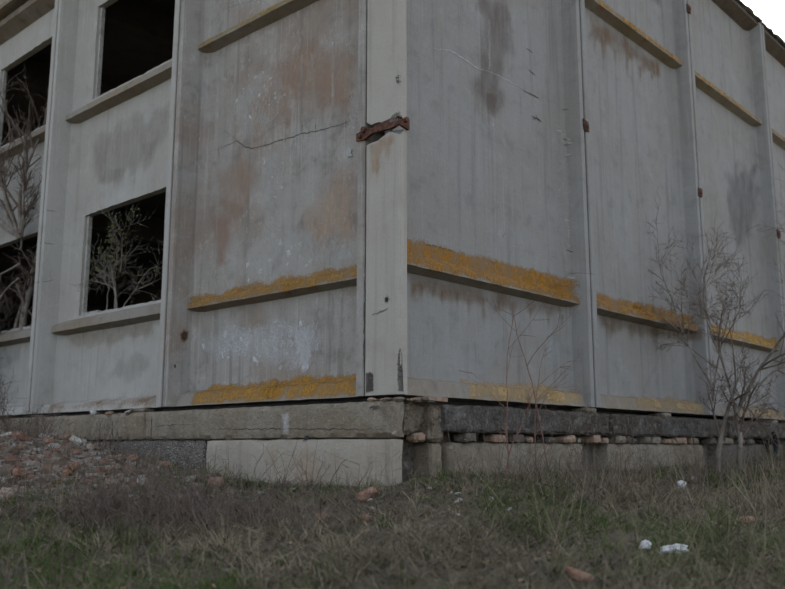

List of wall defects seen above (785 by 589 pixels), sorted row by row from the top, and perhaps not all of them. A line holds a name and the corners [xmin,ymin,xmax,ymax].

crack [218,119,355,153]